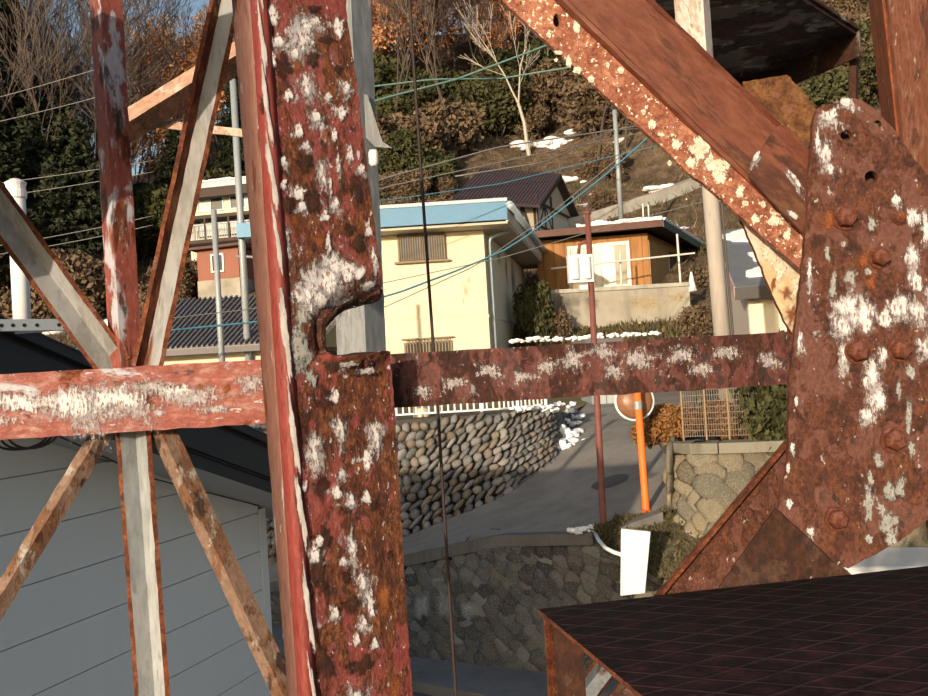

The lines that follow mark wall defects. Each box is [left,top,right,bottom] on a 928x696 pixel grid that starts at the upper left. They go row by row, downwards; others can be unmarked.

corrosion [274,50,319,80]
peeling [815,97,863,174]
corrosion [282,195,298,227]
corrosion [307,191,322,213]
peeling [255,0,388,696]
peeling [825,191,928,458]
peeling [234,372,262,396]
peeling [0,377,229,446]
corrosion [300,385,334,432]
corrosion [313,475,329,501]
corrosion [310,524,332,594]
corrosion [346,654,373,676]